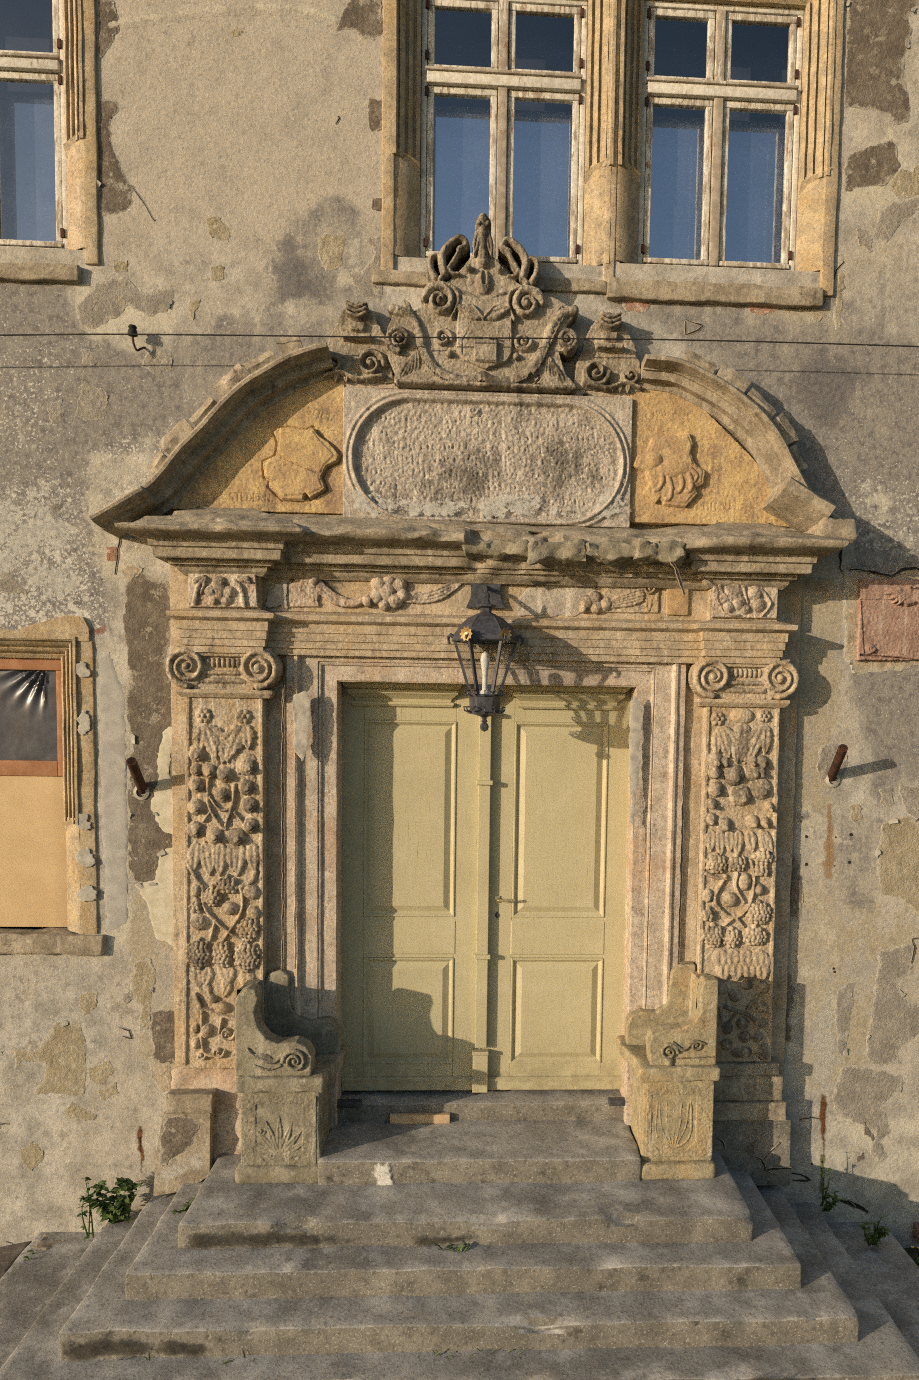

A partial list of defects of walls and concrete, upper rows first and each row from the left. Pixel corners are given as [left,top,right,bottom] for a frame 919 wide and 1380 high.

flaking render [843,0,919,253]
flaking render [97,547,172,932]
flaking render [1,991,119,1121]
flaking render [832,944,919,1162]
flaking render [875,784,919,915]
crack [910,936,919,964]